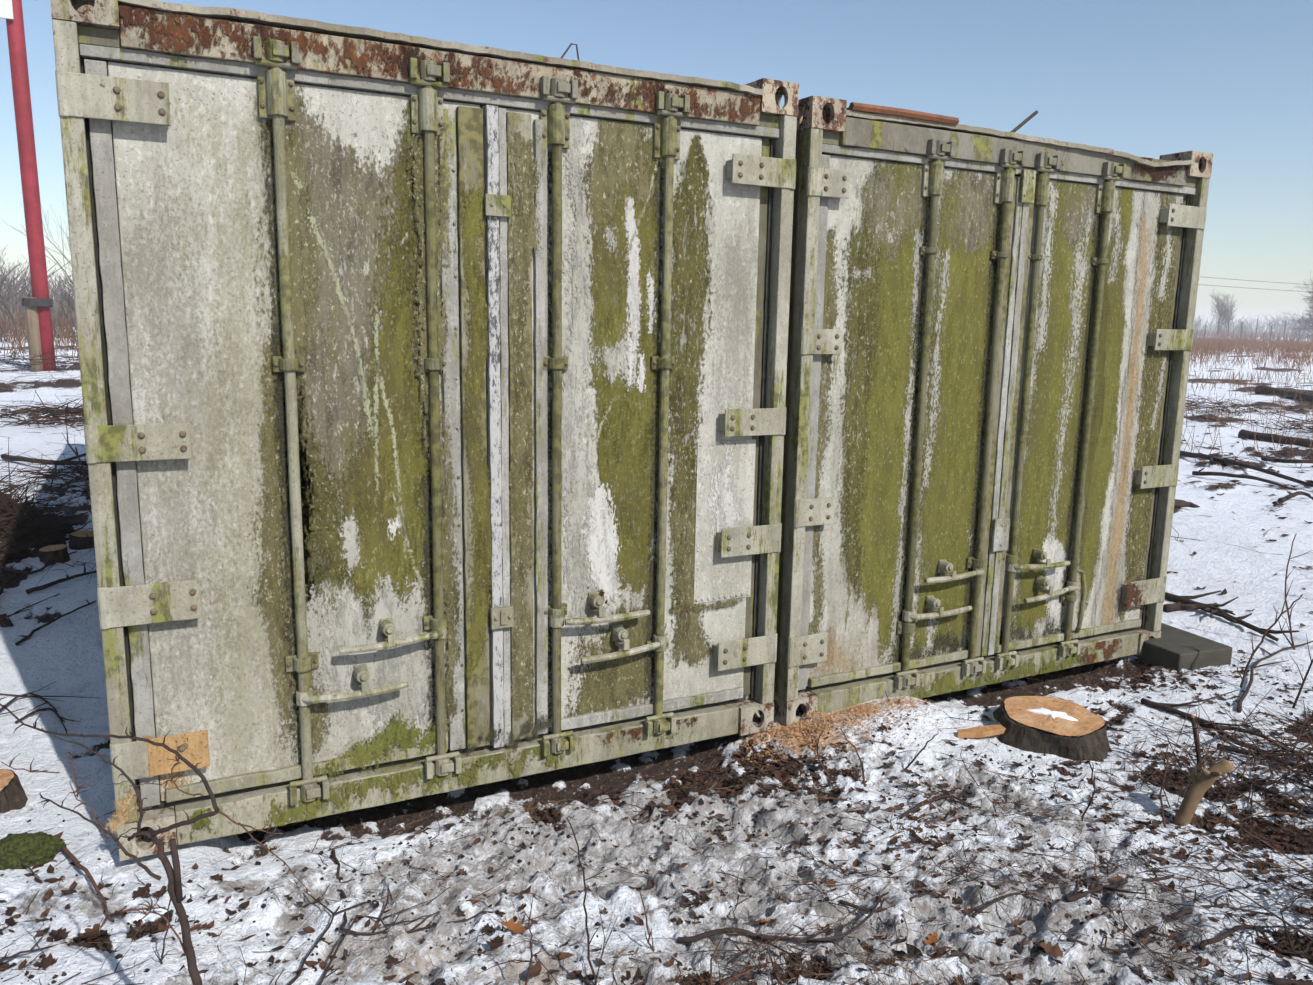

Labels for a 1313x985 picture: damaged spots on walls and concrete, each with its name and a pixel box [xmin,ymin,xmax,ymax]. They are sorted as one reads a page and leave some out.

rust [119,5,761,123]
rust [105,786,139,834]
rust [160,770,192,801]
damp [262,120,297,655]
damp [289,671,301,764]
damp [419,373,436,737]
damp [644,165,664,704]
damp [882,198,999,664]
damp [999,214,1100,644]